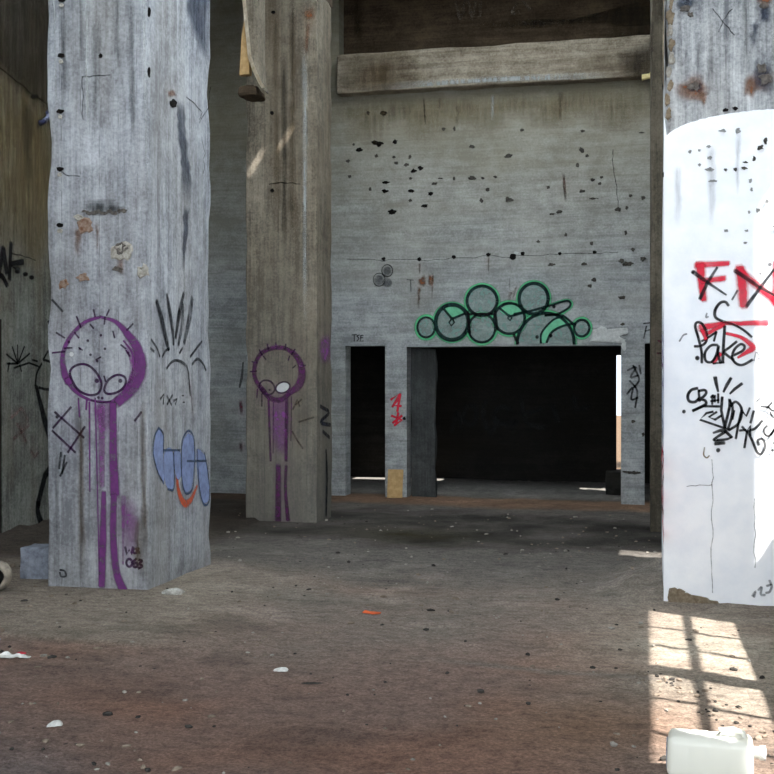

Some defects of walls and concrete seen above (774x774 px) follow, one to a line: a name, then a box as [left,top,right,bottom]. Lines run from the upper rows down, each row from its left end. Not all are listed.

corrosion [752,0,770,43]
leakage [0,0,49,99]
corrosion [680,78,706,104]
corrosion [746,63,773,95]
spalling [73,204,127,245]
spalling [110,241,133,272]
spalling [58,273,89,290]
peeling [668,587,719,604]